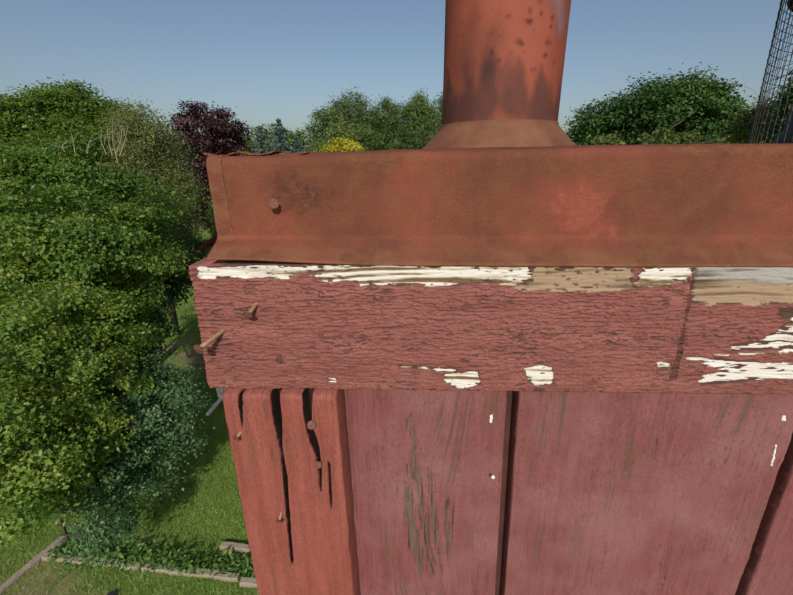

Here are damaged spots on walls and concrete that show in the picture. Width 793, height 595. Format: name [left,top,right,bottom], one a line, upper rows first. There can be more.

peeling [196,265,793,306]
peeling [685,317,793,387]
peeling [421,366,480,389]
peeling [524,365,554,386]
crack [238,388,246,428]
crack [302,388,332,508]
crack [271,388,294,564]